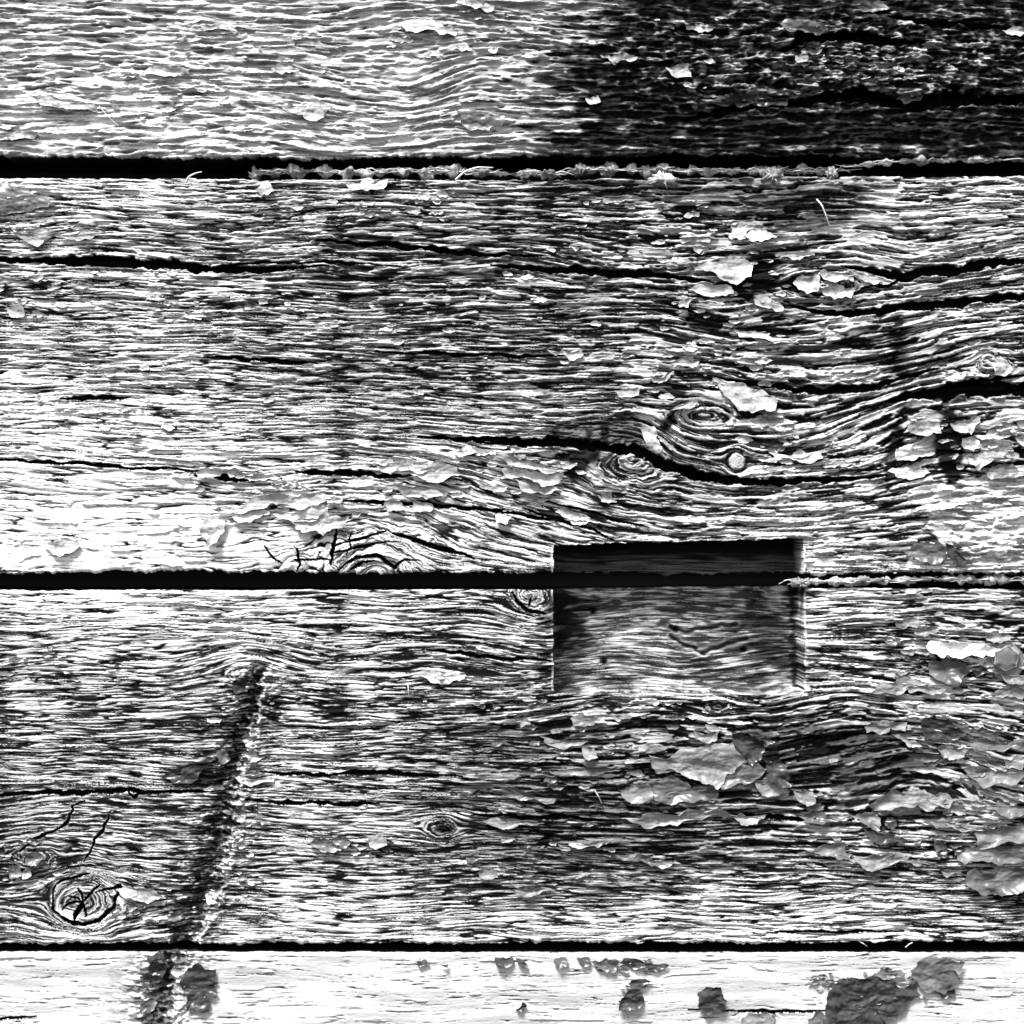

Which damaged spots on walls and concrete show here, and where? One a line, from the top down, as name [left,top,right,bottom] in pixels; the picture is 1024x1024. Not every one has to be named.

crack [0,238,715,284]
peeling [615,208,882,413]
peeling [171,467,362,546]
crack [0,458,649,572]
peeling [376,445,586,512]
crack [417,434,886,488]
peeling [888,408,1024,480]
peeling [871,617,1024,700]
peeling [418,670,1024,897]
crack [0,787,214,927]
peeling [104,669,306,1024]
peeling [808,955,965,1024]